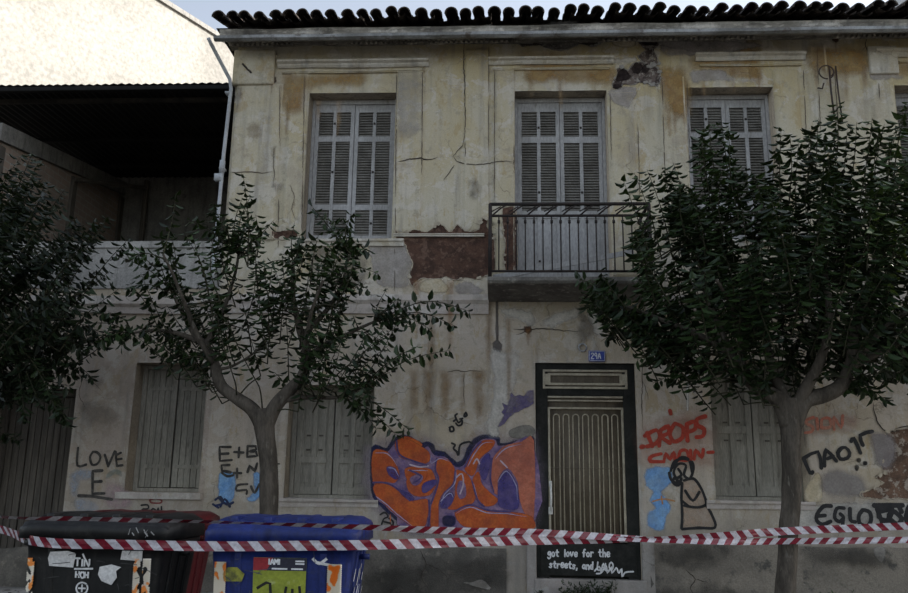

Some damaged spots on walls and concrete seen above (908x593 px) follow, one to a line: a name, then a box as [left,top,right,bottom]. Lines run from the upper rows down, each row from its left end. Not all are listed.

crack [398,50,511,179]
spalling [612,41,664,89]
spalling [394,206,518,288]
spalling [799,427,908,527]